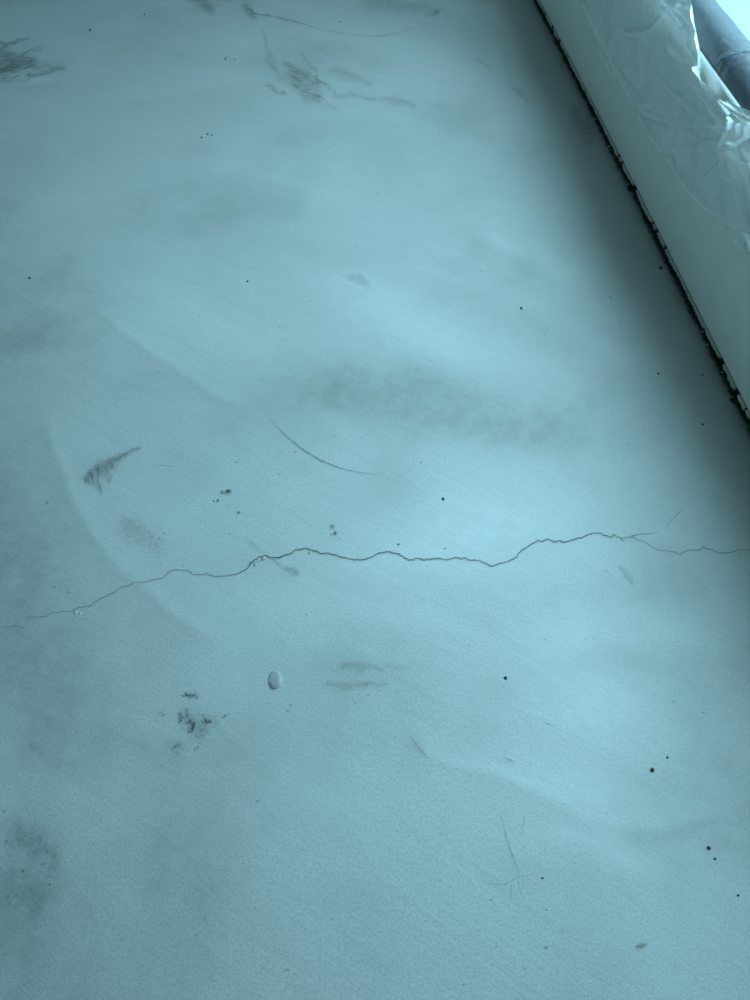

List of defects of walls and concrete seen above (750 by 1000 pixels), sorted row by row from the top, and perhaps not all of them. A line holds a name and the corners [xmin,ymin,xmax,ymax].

crack [49,532,750,615]